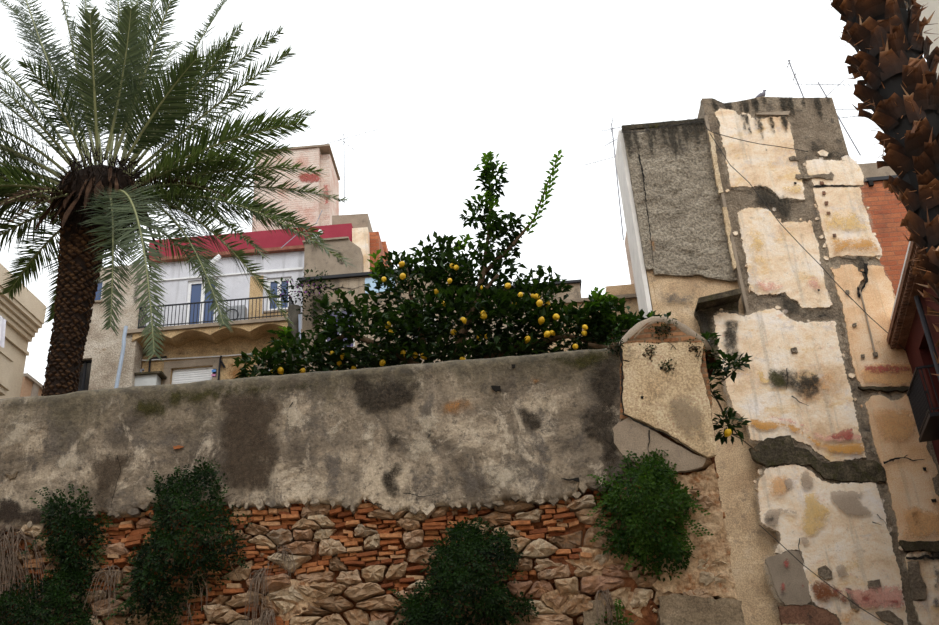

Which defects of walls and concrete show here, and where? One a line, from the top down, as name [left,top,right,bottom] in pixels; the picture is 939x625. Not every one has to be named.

damp [712,97,832,137]
damp [621,118,704,163]
damp [353,374,419,411]
flaking render [621,342,717,458]
damp [778,370,829,397]
flaking render [707,108,939,625]
damp [221,393,309,490]
damp [410,416,438,460]
flaking render [216,495,436,517]
damp [382,464,400,496]
flaking render [448,477,614,512]